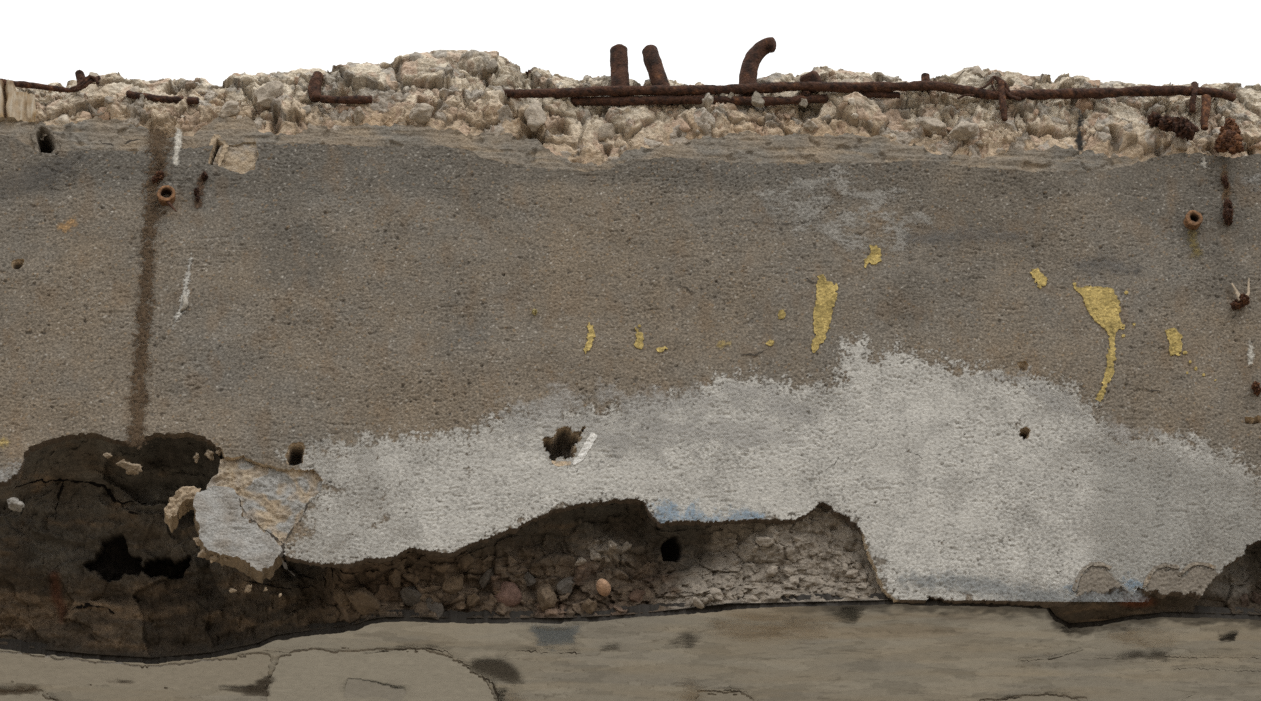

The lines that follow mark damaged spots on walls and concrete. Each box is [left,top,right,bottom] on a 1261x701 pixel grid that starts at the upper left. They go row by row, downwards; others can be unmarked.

spalling [0,76,101,93]
spalling [126,90,199,105]
spalling [308,71,372,104]
spalling [503,37,1236,131]
crack [15,478,147,519]
peeling [0,332,1261,701]